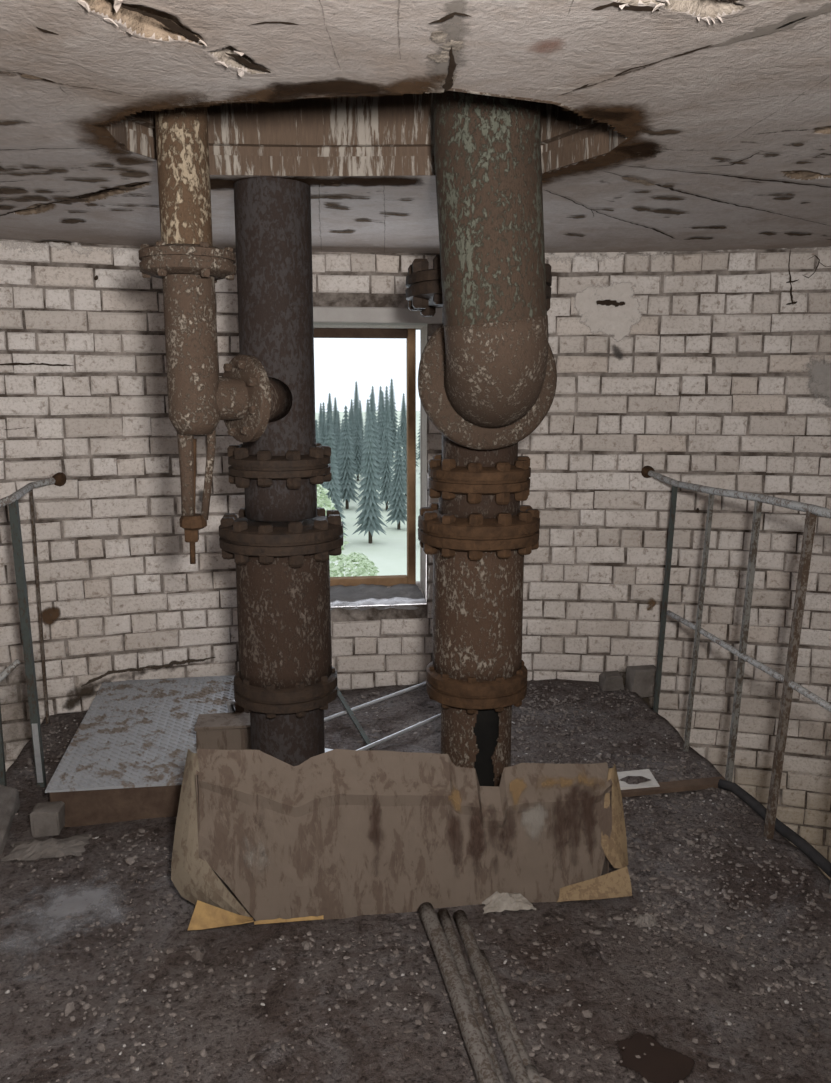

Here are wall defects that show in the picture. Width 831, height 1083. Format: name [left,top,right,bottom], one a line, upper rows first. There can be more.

spalling [67,0,281,77]
peeling [425,31,464,93]
spalling [591,0,769,25]
crack [547,3,831,101]